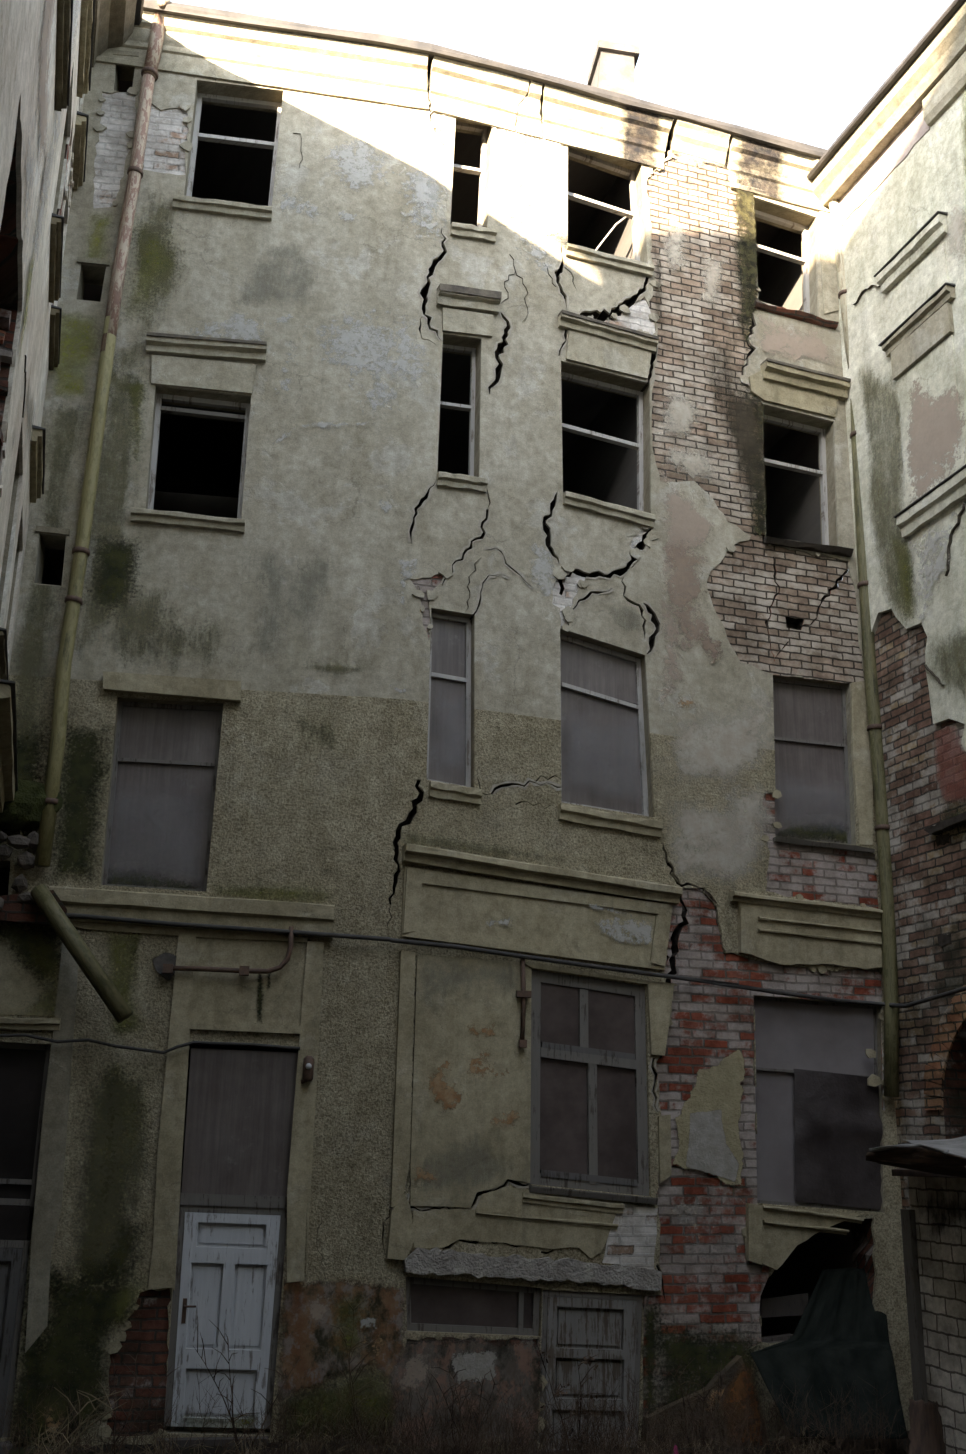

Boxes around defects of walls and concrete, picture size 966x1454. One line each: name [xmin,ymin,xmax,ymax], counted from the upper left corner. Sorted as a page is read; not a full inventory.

flaking render [93,87,192,208]
damp [129,197,175,327]
crack [417,226,449,341]
crack [487,245,654,394]
crack [440,489,663,655]
damp [13,584,194,889]
crack [387,780,423,927]
crack [665,853,721,983]
flaking render [587,153,966,1408]
damp [69,1065,146,1283]
crack [316,1179,553,1284]
flaking render [98,1288,171,1439]